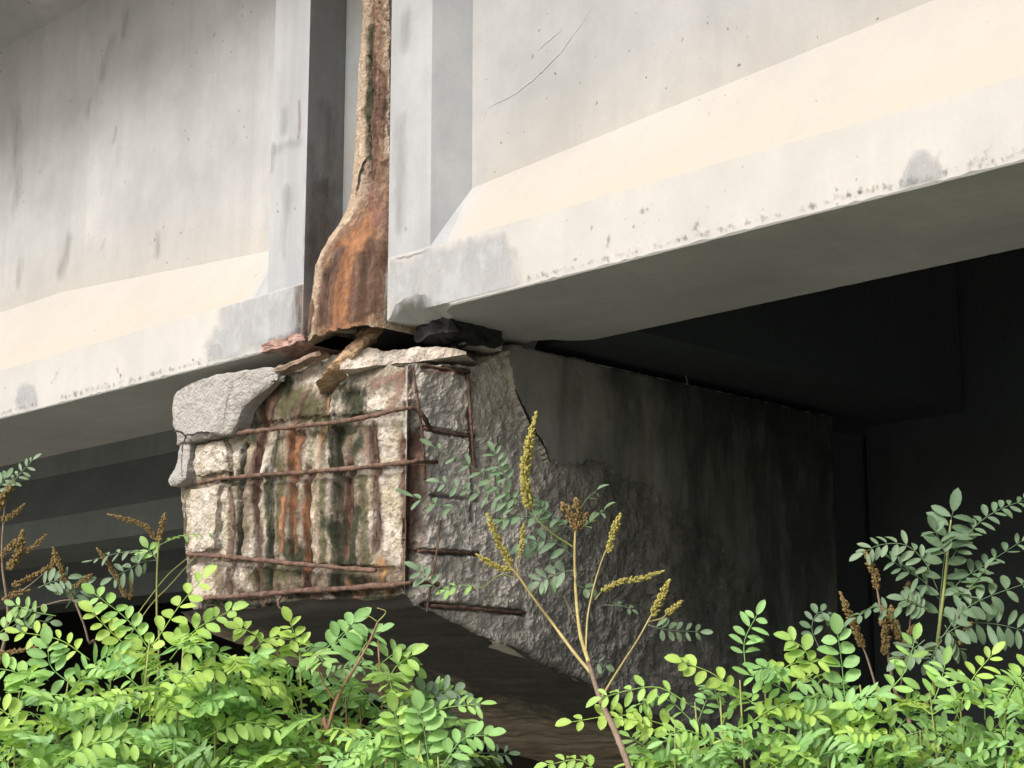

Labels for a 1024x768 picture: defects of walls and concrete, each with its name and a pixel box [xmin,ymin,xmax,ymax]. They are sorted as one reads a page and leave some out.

rust [287,0,389,338]
rust [227,471,236,594]
rust [250,383,281,607]
rust [279,392,322,599]
leakage [202,366,407,609]
rust [343,455,364,600]
rust [354,422,388,593]
rust [398,428,428,592]
spalling [168,342,836,768]